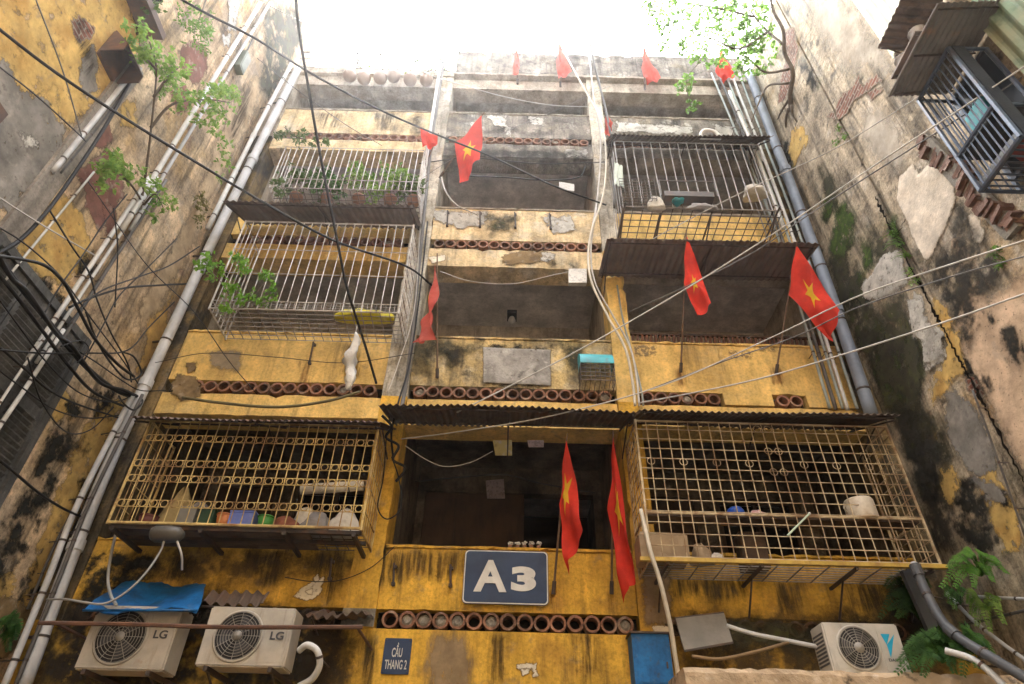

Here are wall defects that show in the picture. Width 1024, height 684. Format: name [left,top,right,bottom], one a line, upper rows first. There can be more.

peeling [71,15,100,95]
peeling [433,209,517,234]
peeling [501,250,577,269]
leakage [818,166,838,207]
leakage [867,224,893,259]
peeling [826,73,984,269]
peeling [861,250,947,371]
crack [874,196,1024,482]
spalling [170,362,201,401]
leakage [828,255,999,552]
leakage [0,389,116,601]
leakage [380,545,463,584]